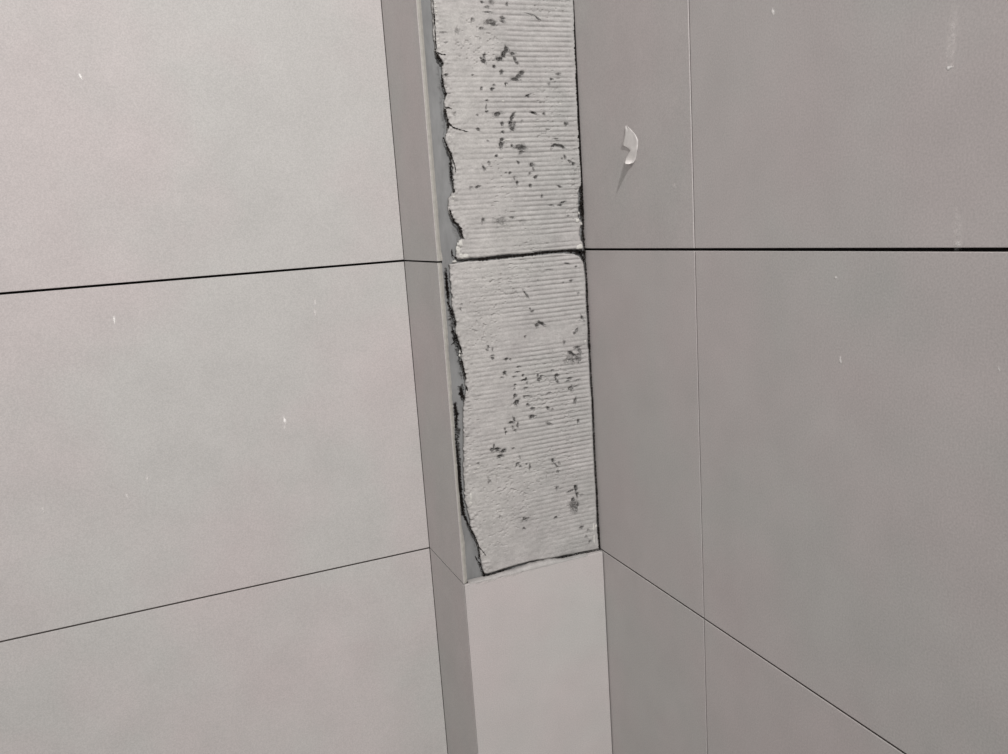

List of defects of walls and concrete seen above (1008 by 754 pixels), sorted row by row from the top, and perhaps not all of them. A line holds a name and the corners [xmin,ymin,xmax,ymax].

spalling [480,46,536,187]
spalling [503,366,577,418]